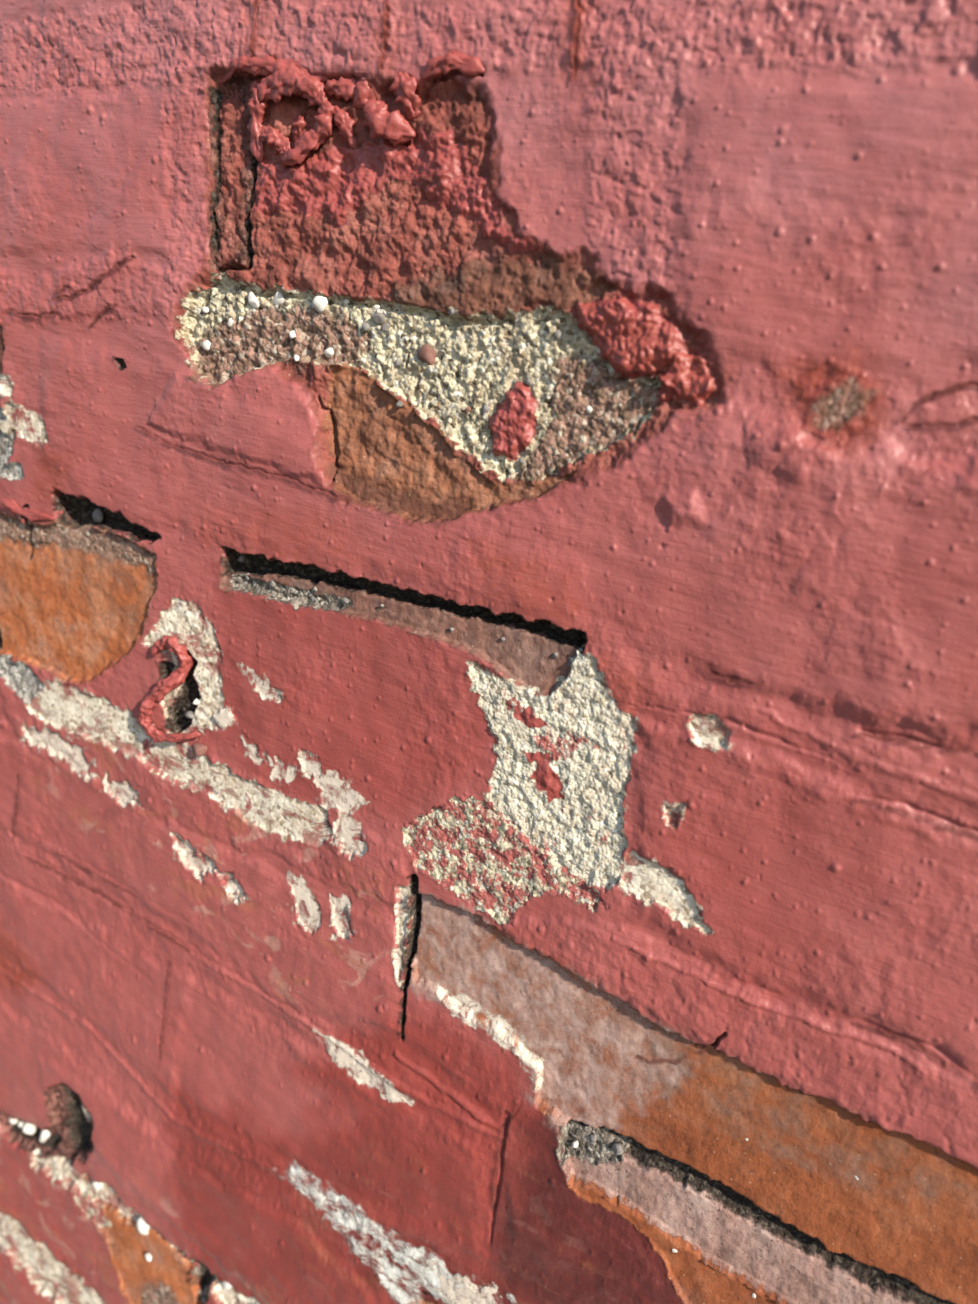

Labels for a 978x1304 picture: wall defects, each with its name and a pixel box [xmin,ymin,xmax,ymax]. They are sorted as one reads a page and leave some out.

spalling [172,49,725,523]
peeling [0,325,48,481]
crack [900,382,978,428]
spalling [0,488,370,859]
crack [218,547,587,696]
peeling [170,832,249,906]
peeling [287,871,353,941]
crack [391,874,422,1040]
peeling [402,644,978,1304]
peeling [74,1186,203,1304]
crack [493,1103,521,1210]
crack [556,1119,954,1304]